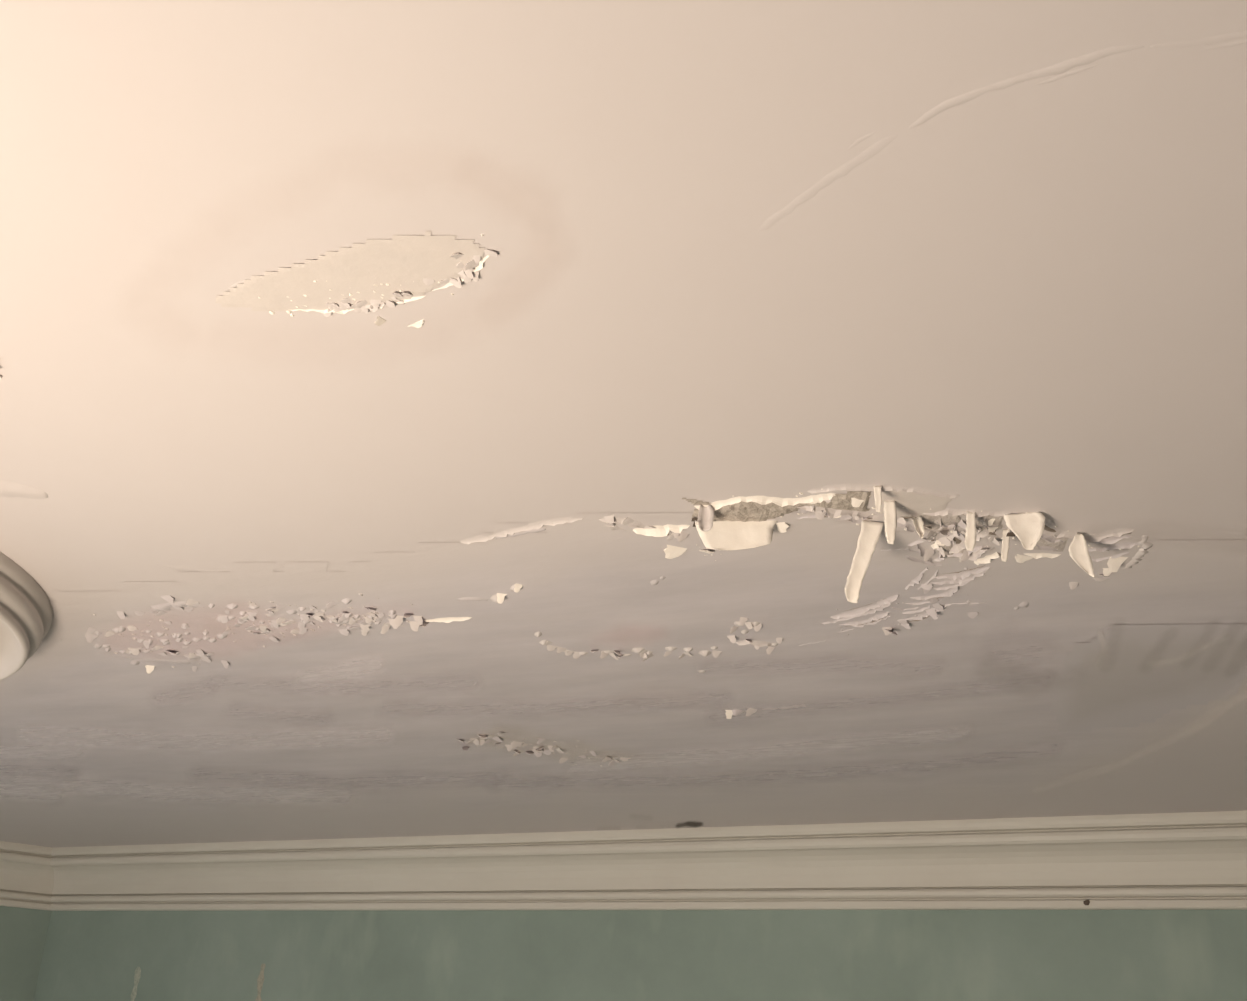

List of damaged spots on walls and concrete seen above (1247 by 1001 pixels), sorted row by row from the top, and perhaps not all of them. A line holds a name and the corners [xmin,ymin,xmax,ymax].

water stain [0,512,1247,831]
peeling [599,484,1153,636]